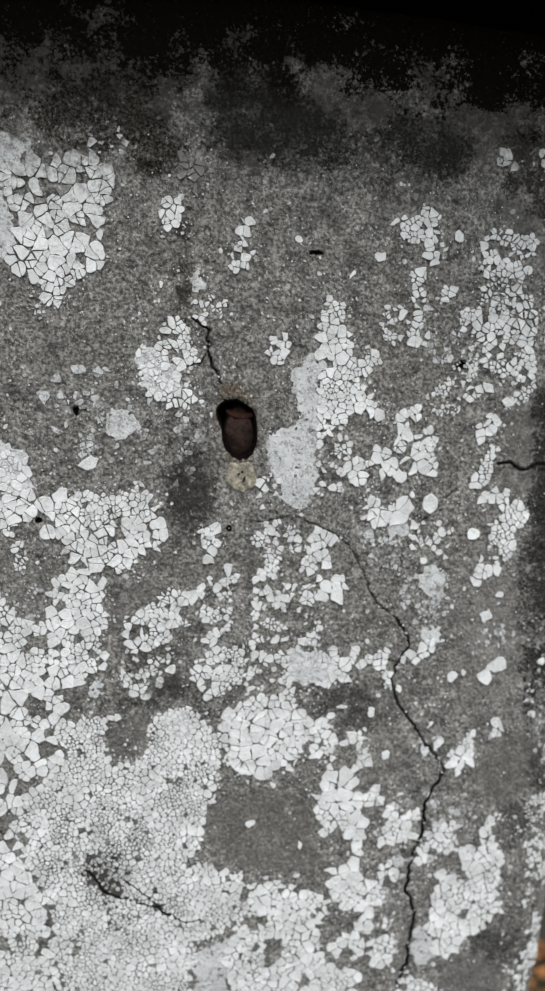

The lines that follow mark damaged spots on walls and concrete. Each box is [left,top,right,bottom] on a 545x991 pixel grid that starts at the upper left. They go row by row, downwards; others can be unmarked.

damp [0,0,545,223]
peeling [0,133,115,308]
peeling [36,364,119,470]
peeling [131,294,228,487]
peeling [264,332,292,365]
peeling [312,206,545,506]
peeling [467,413,530,587]
crack [498,461,545,471]
crack [87,870,201,923]
peeling [0,450,515,991]
crack [255,515,444,989]
peeling [502,619,545,991]